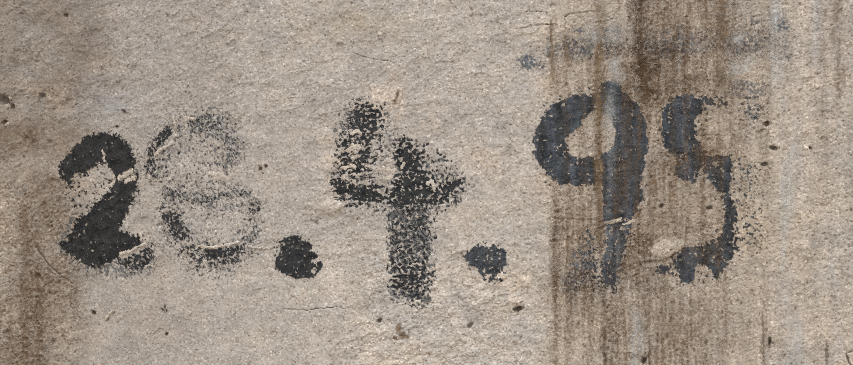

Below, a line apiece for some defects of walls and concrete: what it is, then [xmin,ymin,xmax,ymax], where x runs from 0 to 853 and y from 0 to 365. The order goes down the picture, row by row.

water stain [589,0,692,139]
water stain [622,149,689,284]
water stain [566,264,696,365]